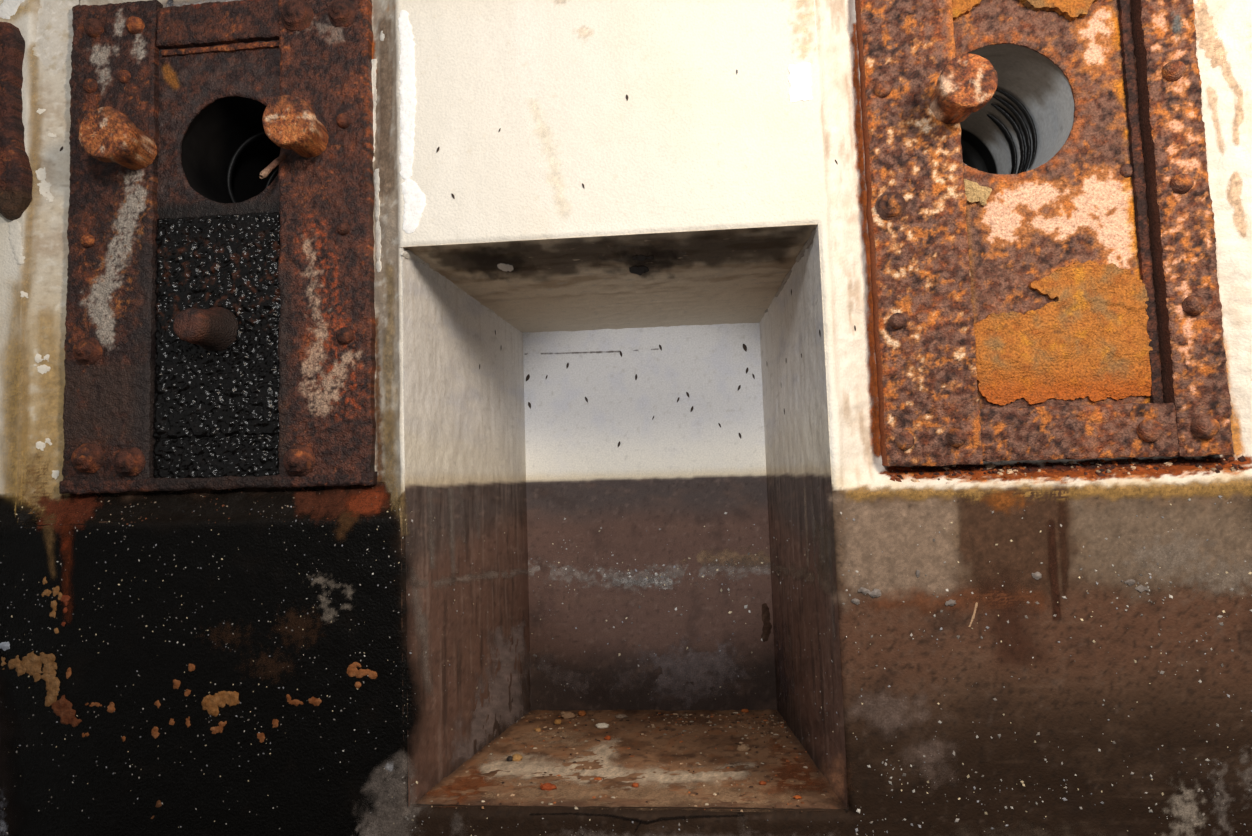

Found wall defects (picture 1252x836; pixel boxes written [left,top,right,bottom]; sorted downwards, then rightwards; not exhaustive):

peeling [0,0,25,20]
corrosion [952,0,982,20]
corrosion [1018,0,1098,22]
damp [15,48,39,312]
corrosion [851,24,1252,660]
corrosion [294,318,390,539]
corrosion [38,494,97,617]
damp [0,319,771,836]
damp [832,478,1252,599]
damp [1162,789,1203,836]